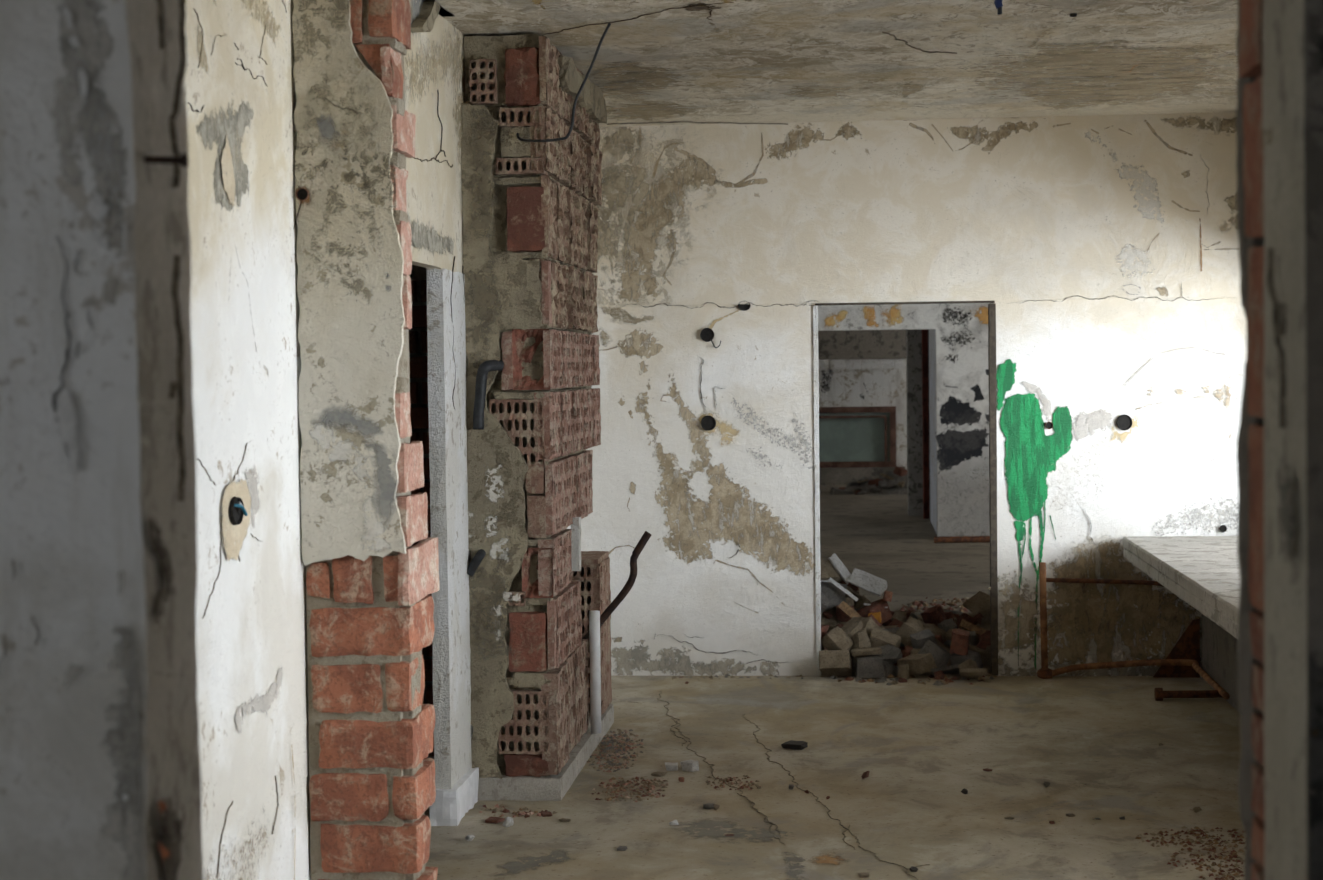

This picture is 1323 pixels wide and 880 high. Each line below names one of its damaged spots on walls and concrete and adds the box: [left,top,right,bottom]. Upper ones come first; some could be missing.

crack [542,2,734,36]
crack [882,31,957,54]
crack [157,0,287,188]
spalling [196,101,253,212]
crack [414,90,453,168]
peeling [905,117,1071,153]
peeling [616,122,862,303]
peeling [945,369,989,423]
spalling [599,329,815,604]
water stain [989,539,1202,676]
crack [216,801,233,878]
crack [271,776,279,834]